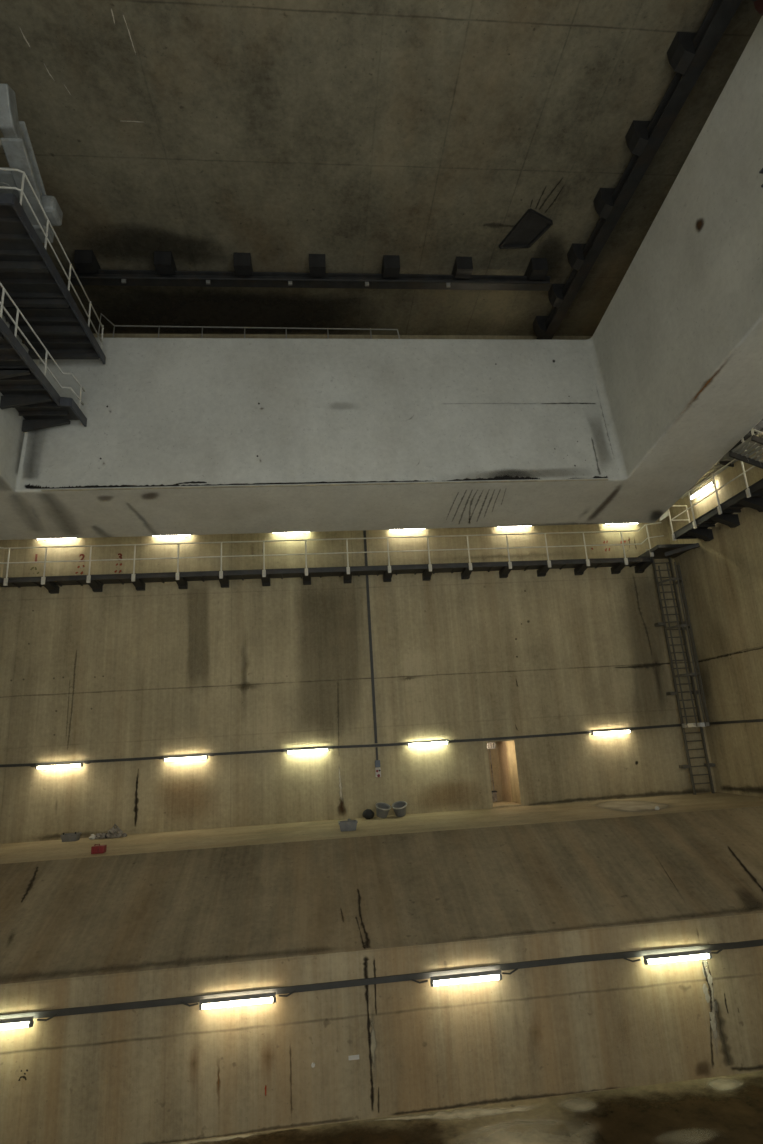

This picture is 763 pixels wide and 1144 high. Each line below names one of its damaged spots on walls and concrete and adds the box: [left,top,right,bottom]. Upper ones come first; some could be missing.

crack [25,480,421,489]
crack [448,474,538,482]
crack [132,769,140,826]
crack [728,847,763,891]
crack [341,889,379,1113]
water stain [155,1066,763,1144]